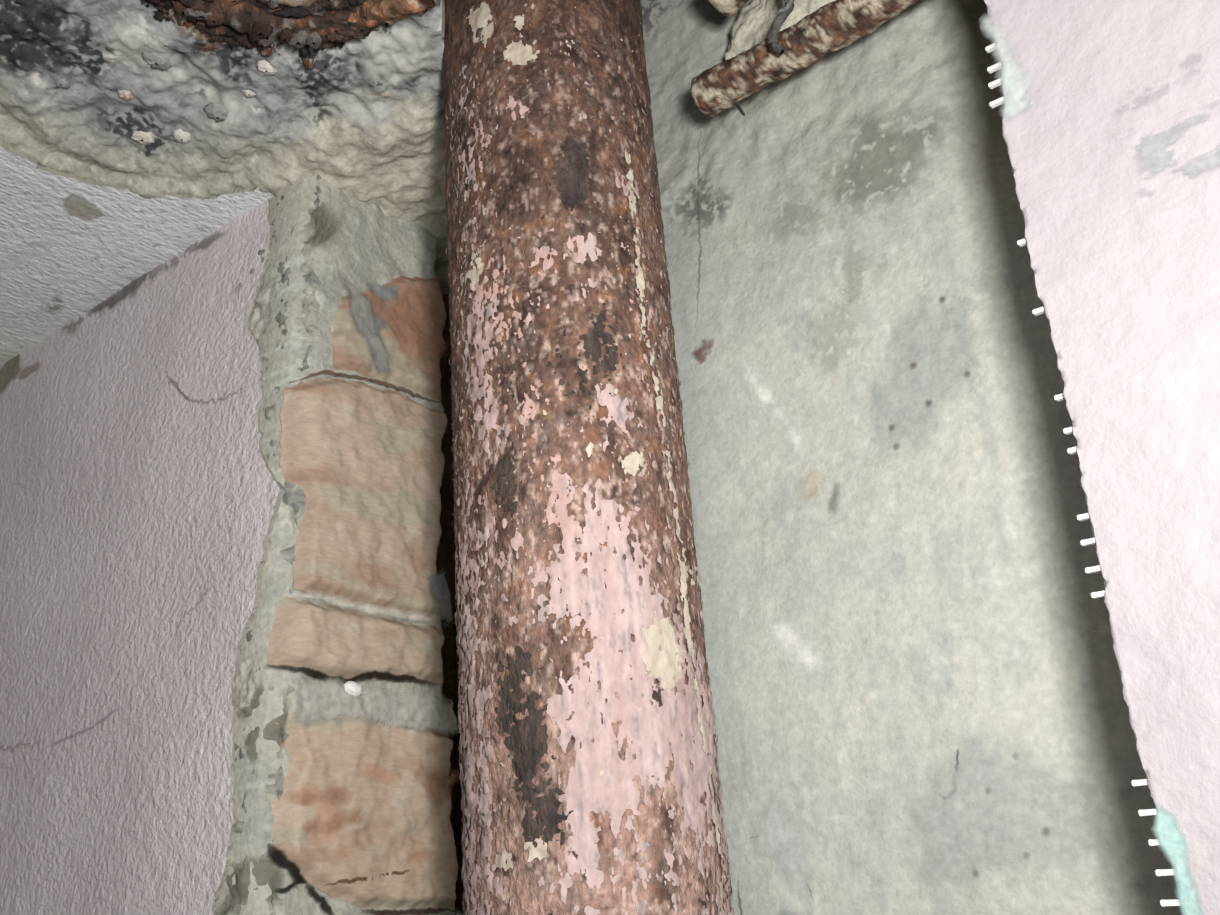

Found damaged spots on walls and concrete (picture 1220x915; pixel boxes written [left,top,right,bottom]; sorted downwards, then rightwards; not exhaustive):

corrosion [141,0,438,72]
corrosion [691,0,922,116]
corrosion [694,344,711,362]
spalling [0,0,734,915]
peeling [1155,809,1202,915]